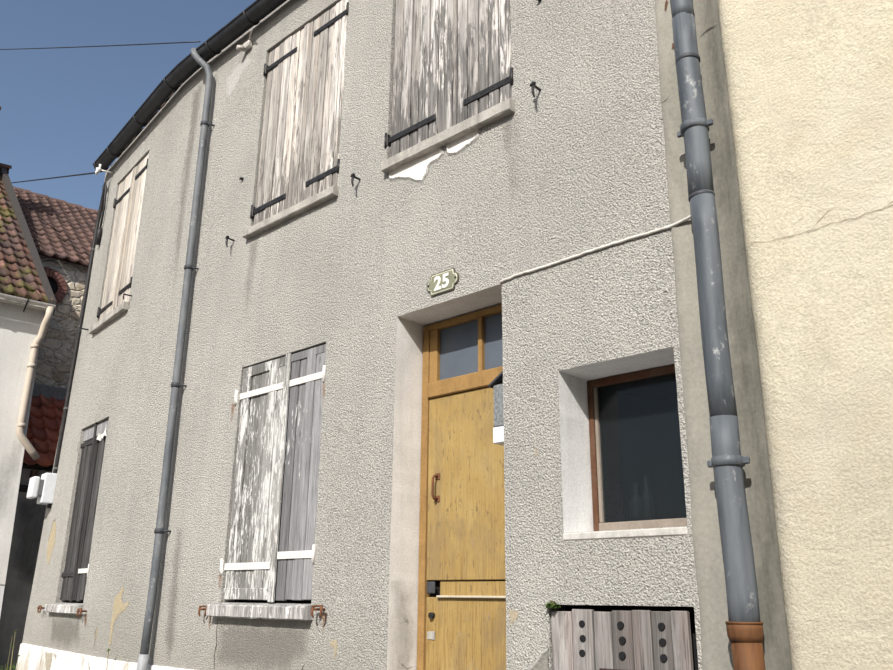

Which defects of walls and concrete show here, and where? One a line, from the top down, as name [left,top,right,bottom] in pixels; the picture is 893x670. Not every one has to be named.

flaking render [387,128,481,183]
crack [751,201,893,243]
peeling [45,652,56,670]